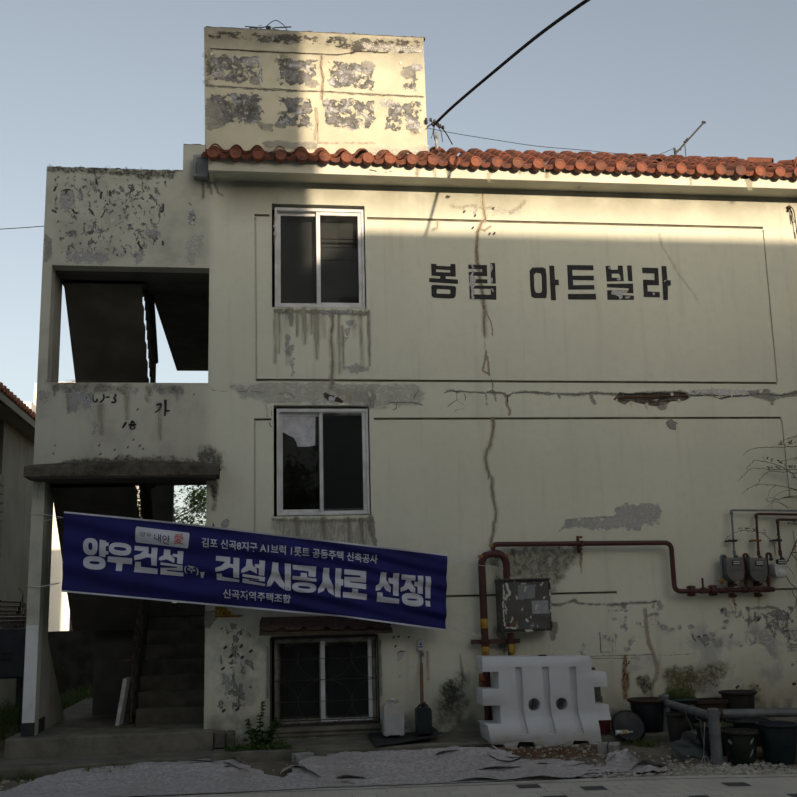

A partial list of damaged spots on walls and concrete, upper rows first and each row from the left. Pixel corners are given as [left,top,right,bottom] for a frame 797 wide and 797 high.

peeling [205,31,422,133]
peeling [45,167,175,265]
damp [274,308,370,376]
crack [444,193,618,545]
spalling [613,386,797,410]
crack [690,393,795,405]
damp [63,439,221,471]
peeling [559,503,662,531]
damp [509,546,576,582]
peeling [658,605,796,655]
peeling [204,610,254,712]
damp [438,660,467,717]